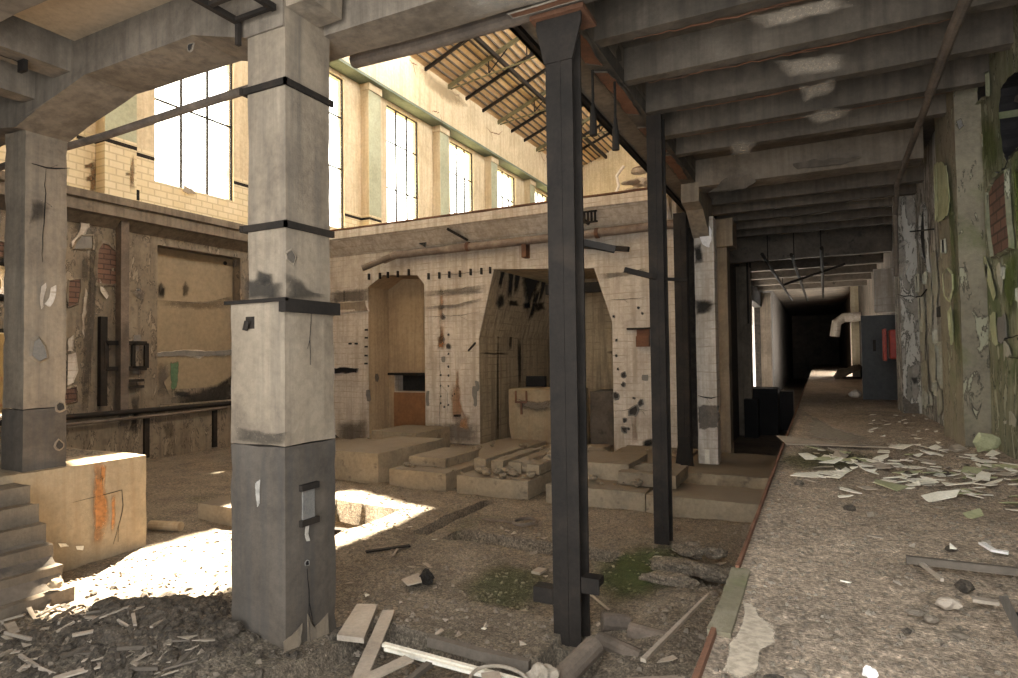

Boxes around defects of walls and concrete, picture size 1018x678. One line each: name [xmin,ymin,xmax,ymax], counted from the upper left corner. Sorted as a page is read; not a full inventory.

corrosion [94,467,115,536]
peeling [790,162,1018,519]